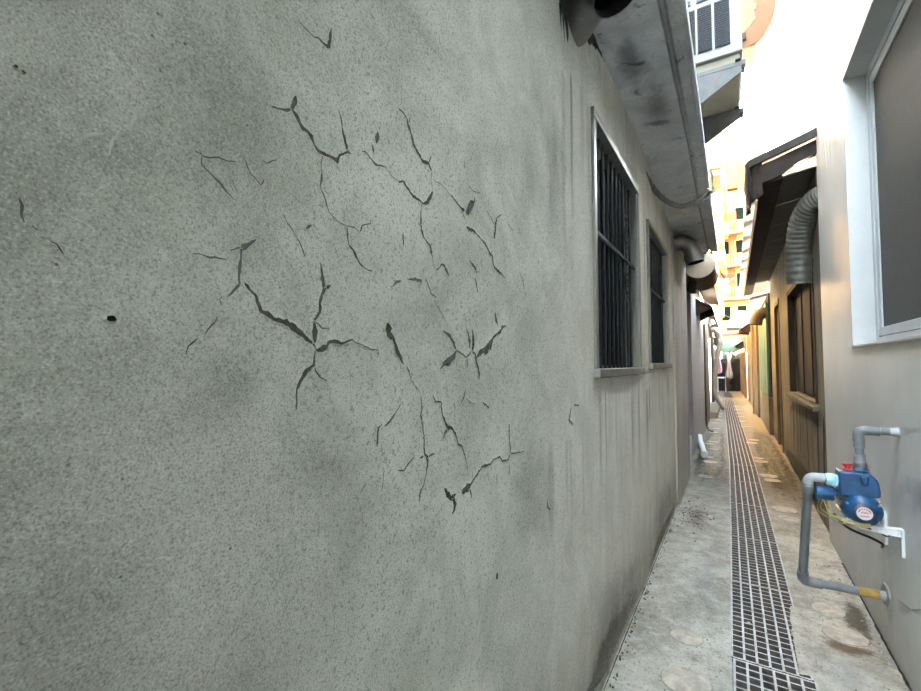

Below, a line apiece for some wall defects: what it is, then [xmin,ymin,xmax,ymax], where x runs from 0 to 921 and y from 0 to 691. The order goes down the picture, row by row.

crack [297,18,335,54]
crack [8,198,72,256]
crack [180,92,527,516]